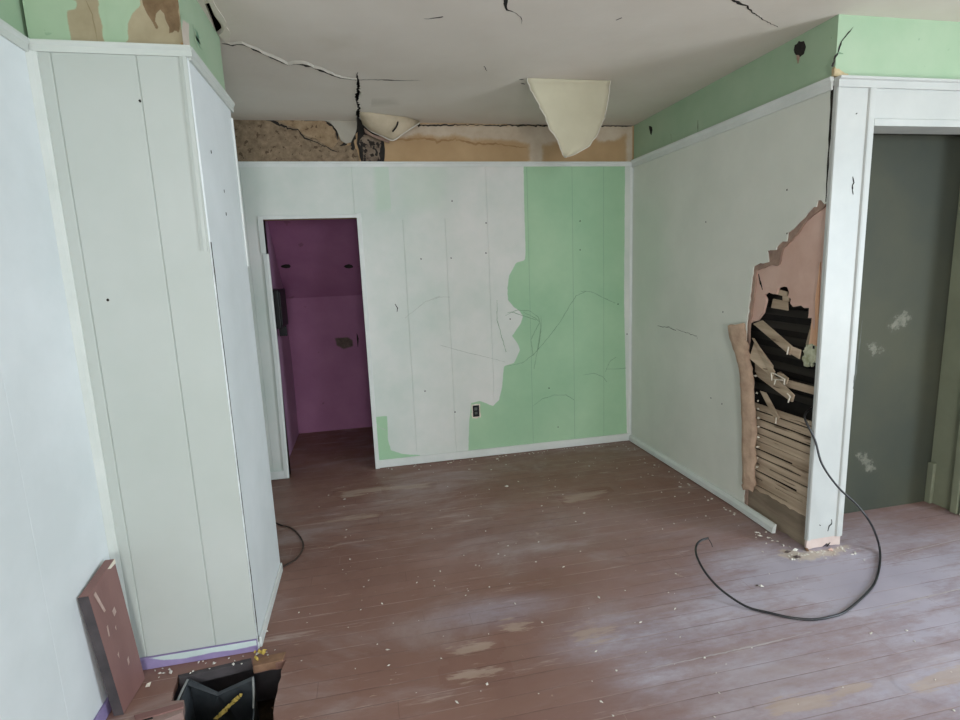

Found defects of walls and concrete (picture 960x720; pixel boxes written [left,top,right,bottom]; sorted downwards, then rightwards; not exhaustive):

peeling [61,0,191,46]
crack [220,41,364,121]
crack [732,0,778,27]
spalling [794,41,806,63]
crack [825,29,852,202]
flaking render [233,112,420,215]
peeling [466,166,679,451]
spalling [728,200,826,546]
peeling [376,414,423,460]